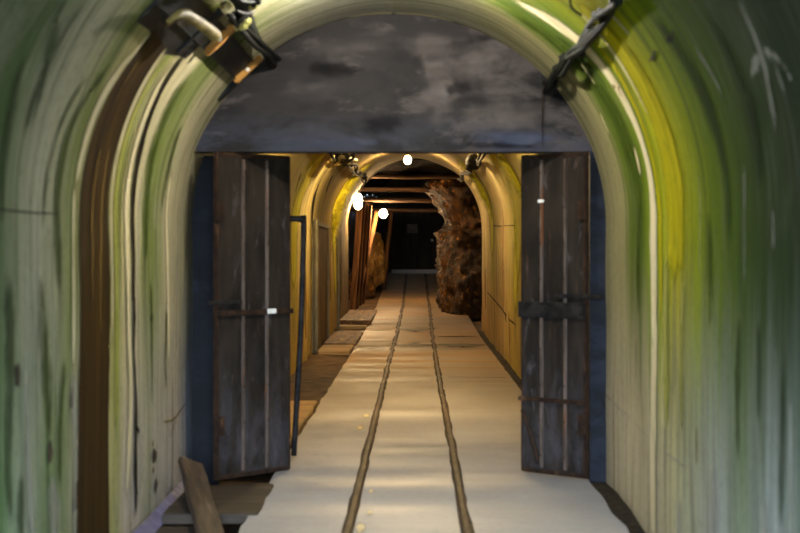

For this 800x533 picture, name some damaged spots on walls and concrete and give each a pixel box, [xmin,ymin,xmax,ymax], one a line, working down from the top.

leakage [1,70,21,212]
leakage [26,0,80,124]
leakage [39,35,149,533]
leakage [110,49,171,493]
leakage [138,79,187,254]
leakage [161,128,181,380]
leakage [515,1,579,53]
leakage [572,3,683,533]
leakage [660,24,729,225]
leakage [748,21,789,115]
leakage [5,291,34,533]
leakage [780,377,793,533]